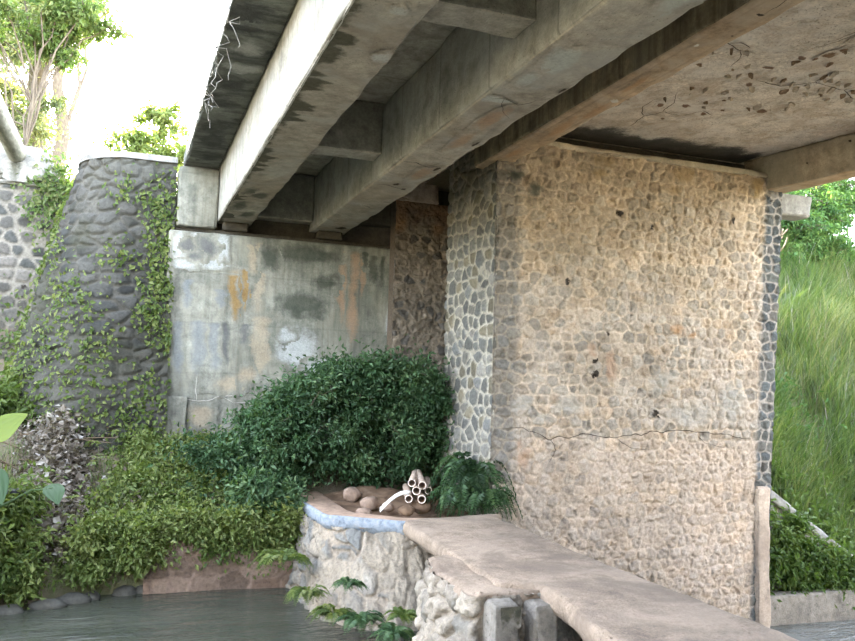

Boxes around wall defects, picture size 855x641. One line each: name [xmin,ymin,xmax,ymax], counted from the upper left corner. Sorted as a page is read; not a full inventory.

water stain [189,0,291,166]
water stain [227,0,355,219]
water stain [368,49,394,67]
crack [630,95,711,126]
peeling [725,48,755,93]
peeling [771,47,855,112]
water stain [177,233,226,265]
rust [224,258,252,331]
water stain [168,239,395,394]
rust [334,248,367,364]
crack [498,427,760,462]